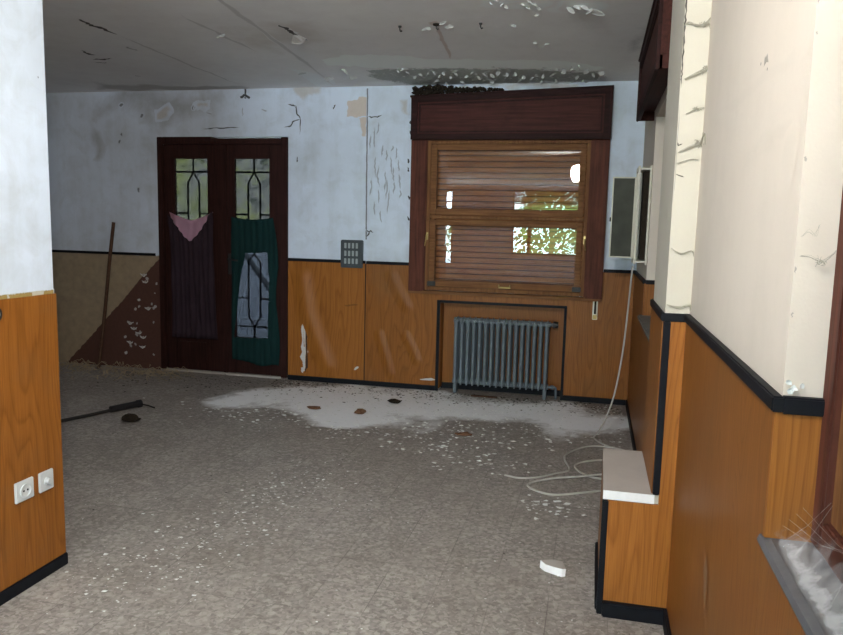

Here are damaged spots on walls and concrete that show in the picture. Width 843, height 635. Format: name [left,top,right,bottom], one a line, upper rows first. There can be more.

peeling [468,0,615,16]
crack [78,19,239,84]
crack [181,0,336,110]
crack [284,104,301,135]
spalling [346,96,367,137]
peeling [287,53,613,104]
crack [673,0,688,204]
crack [365,88,382,240]
spalling [0,249,161,370]